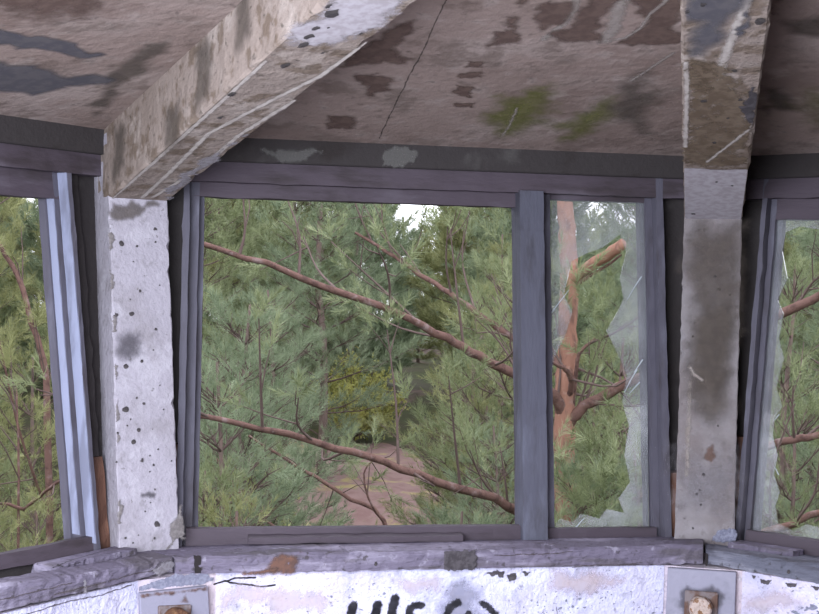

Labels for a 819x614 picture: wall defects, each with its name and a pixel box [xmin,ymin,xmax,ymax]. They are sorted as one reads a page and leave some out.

damp [0,30,104,58]
damp [487,17,520,46]
damp [0,44,165,106]
crack [379,0,447,139]
damp [452,62,483,107]
rust [243,554,298,575]
crack [213,577,276,587]